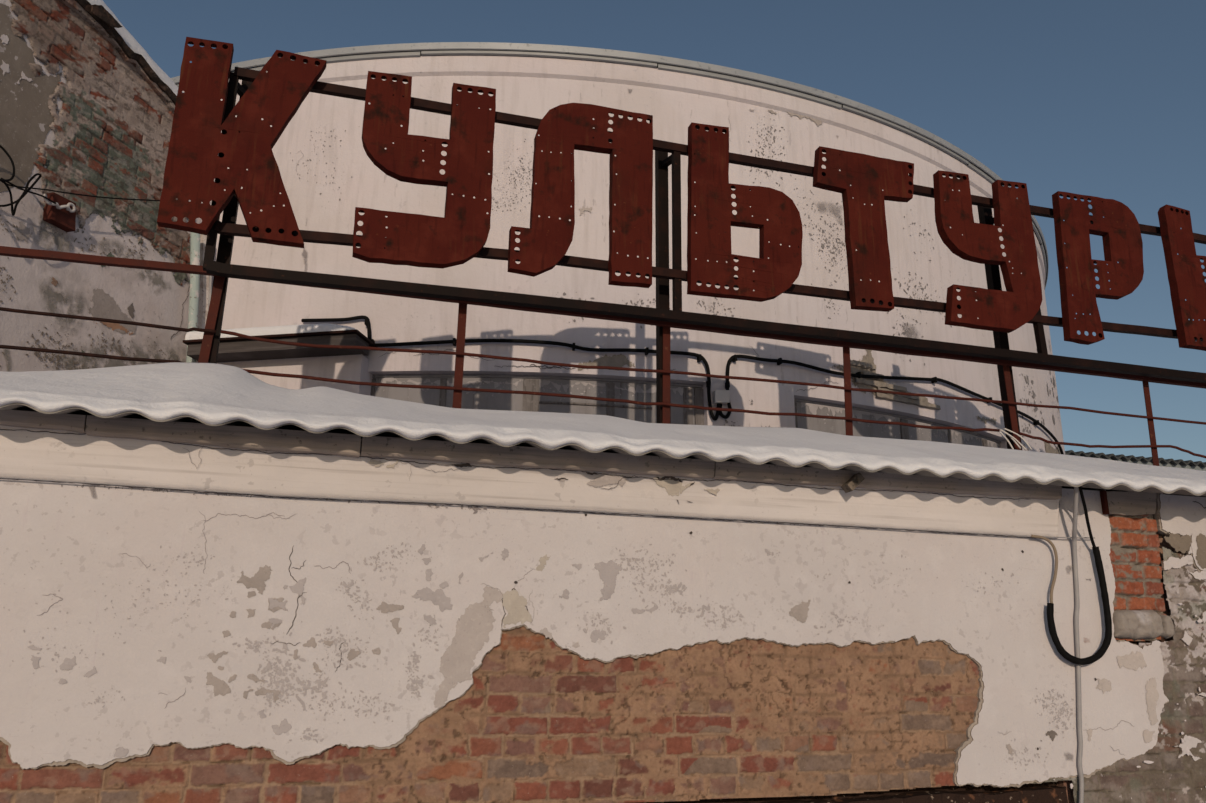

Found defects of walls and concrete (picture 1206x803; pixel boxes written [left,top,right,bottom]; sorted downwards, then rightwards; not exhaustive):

flaking render [0,0,196,285]
crack [0,428,86,436]
flaking render [797,350,996,447]
crack [16,439,1032,572]
crack [271,547,350,646]
crack [483,569,534,625]
flaking render [0,542,979,803]
flaking render [1000,533,1206,803]